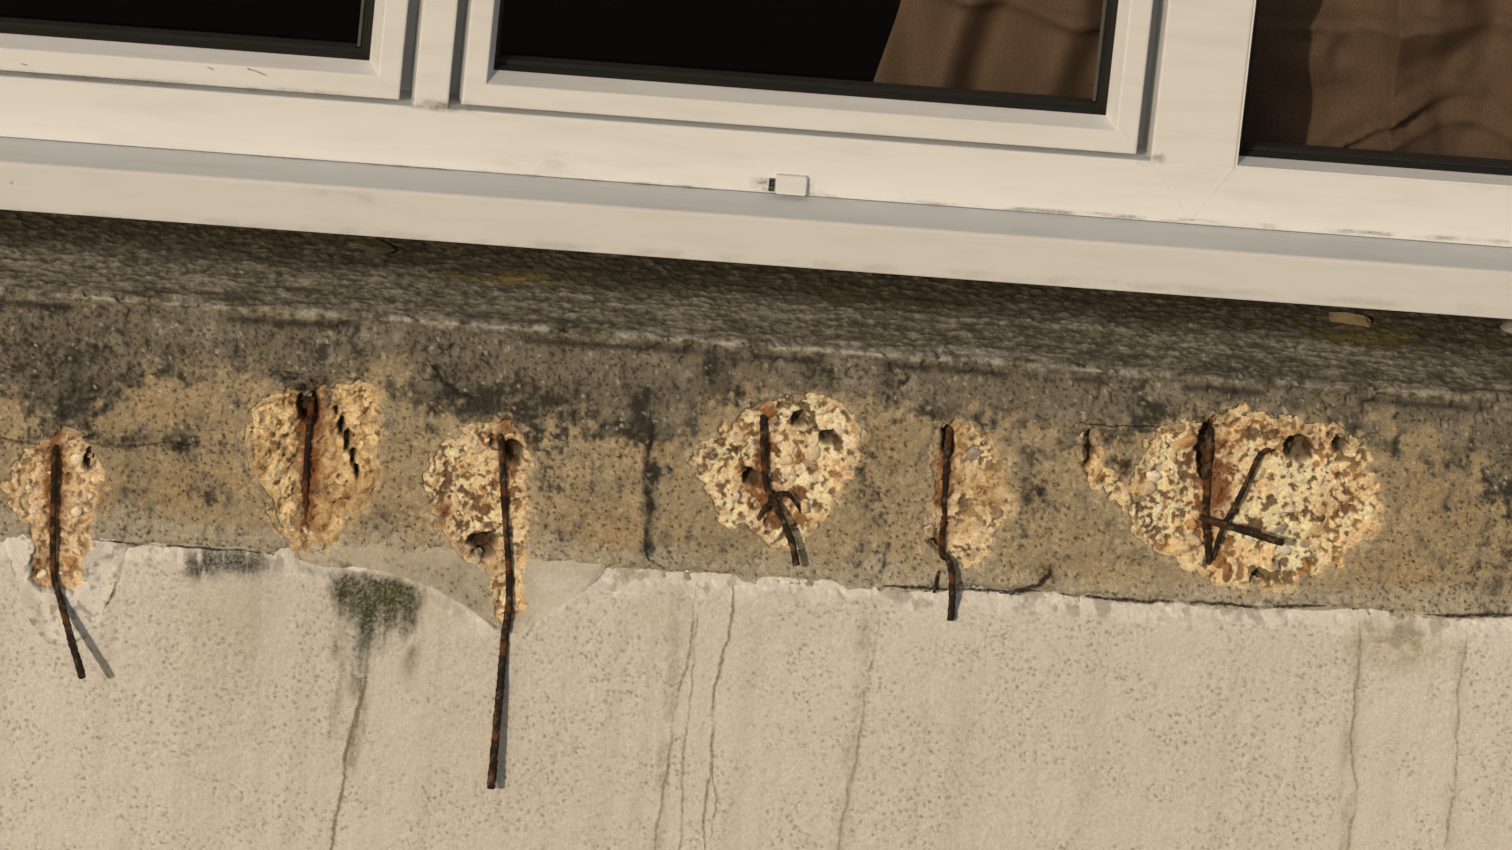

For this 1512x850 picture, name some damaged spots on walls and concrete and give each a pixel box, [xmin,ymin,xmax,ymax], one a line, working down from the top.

spalling [0,426,128,679]
spalling [243,379,605,789]
spalling [688,392,867,567]
spalling [921,418,1018,621]
spalling [1080,402,1384,593]